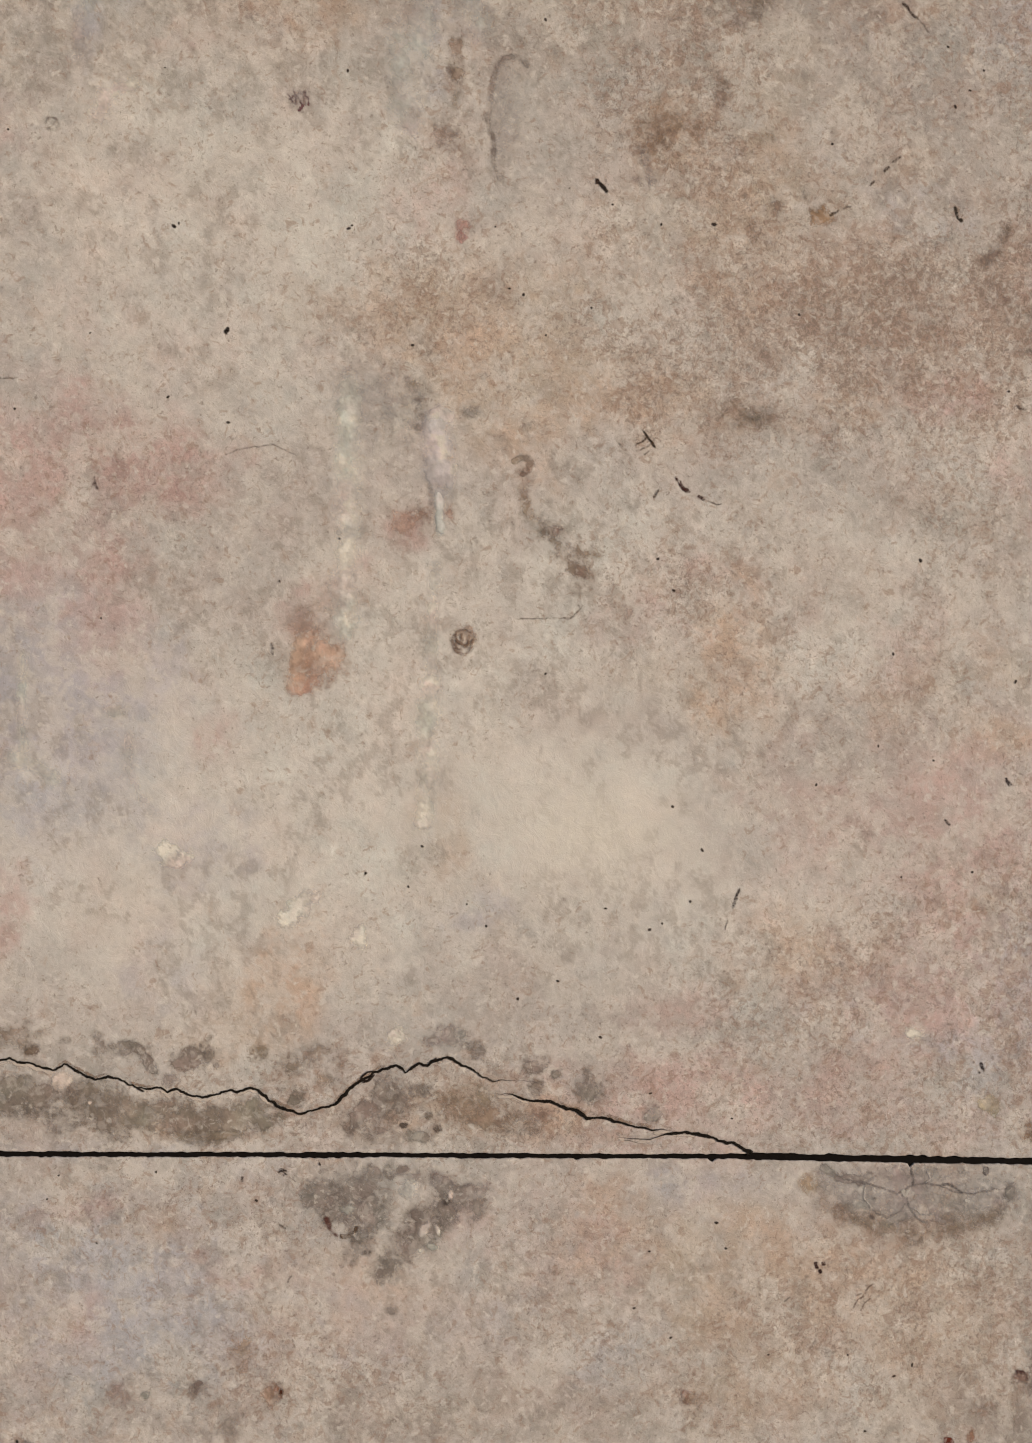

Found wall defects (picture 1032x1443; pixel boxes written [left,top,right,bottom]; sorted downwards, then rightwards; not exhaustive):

crack [0,1056,753,1156]